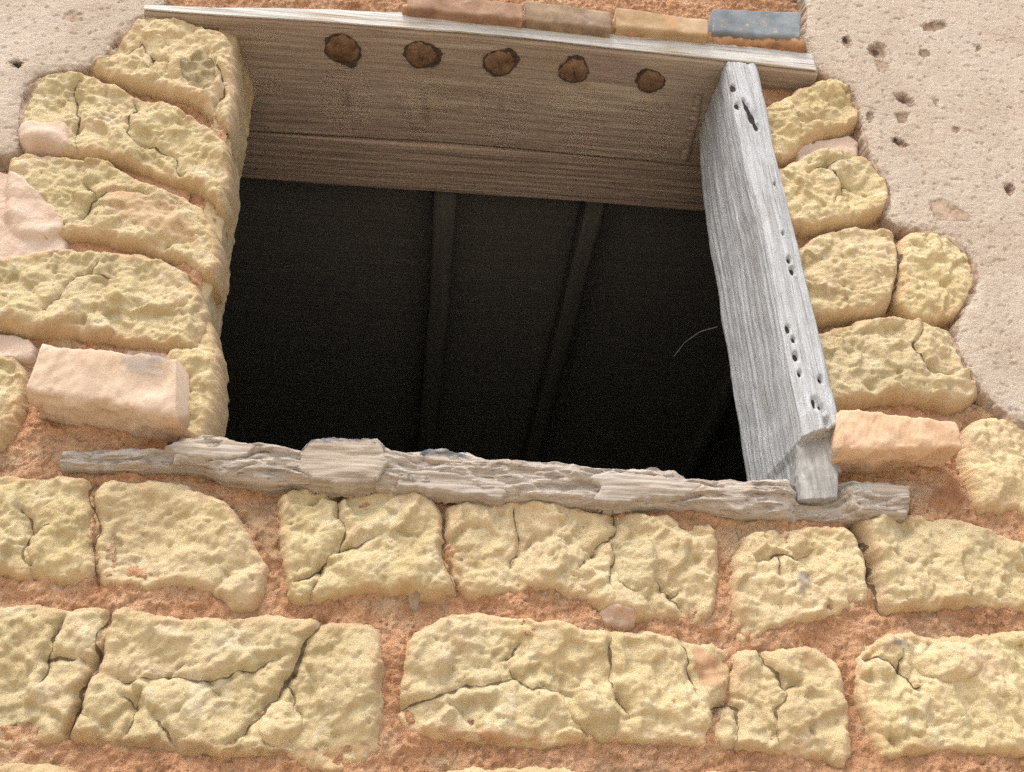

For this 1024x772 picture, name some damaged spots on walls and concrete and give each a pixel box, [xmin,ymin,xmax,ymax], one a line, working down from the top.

crack [73,80,81,148]
crack [126,105,180,177]
crack [209,58,225,102]
crack [21,510,52,577]
crack [89,486,102,586]
crack [296,497,370,596]
crack [580,515,617,585]
crack [40,611,321,748]
crack [402,646,569,711]
crack [608,640,629,714]
crack [759,655,794,741]
crack [864,655,922,690]